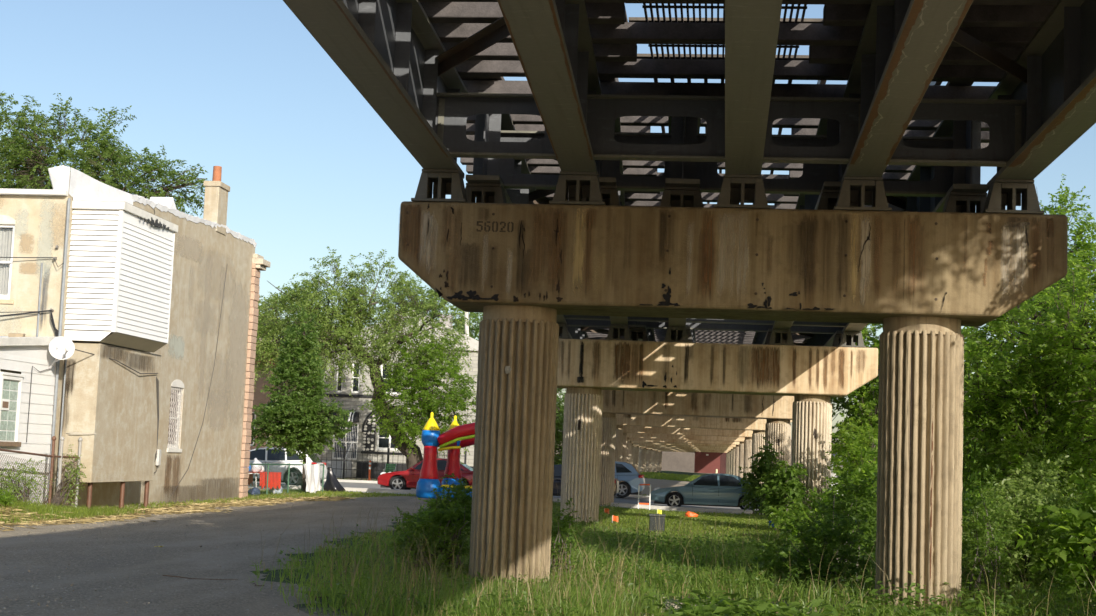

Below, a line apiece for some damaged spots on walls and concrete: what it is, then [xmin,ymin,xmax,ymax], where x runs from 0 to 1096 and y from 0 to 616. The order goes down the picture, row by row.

corrosion [850,0,924,164]
spalling [436,269,499,301]
leakage [573,213,583,289]
spalling [639,267,680,306]